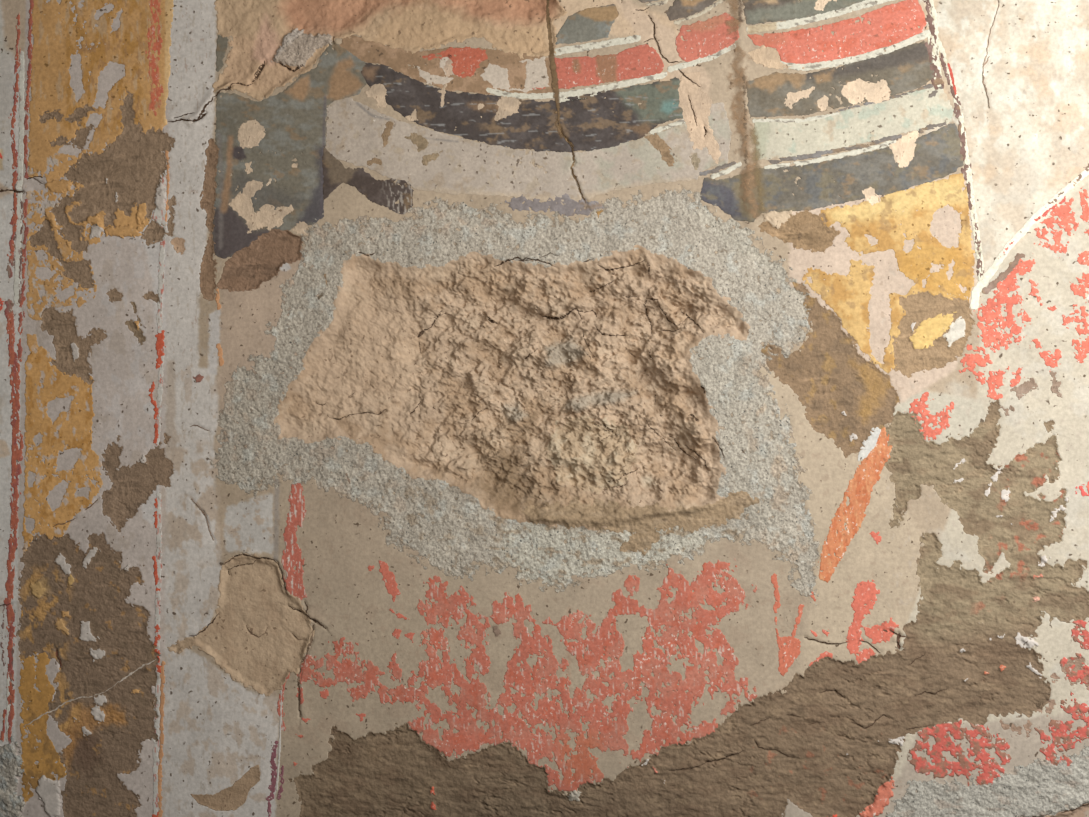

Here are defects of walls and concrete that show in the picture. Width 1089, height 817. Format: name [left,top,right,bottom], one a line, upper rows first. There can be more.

crack [0,176,43,193]
peeling [29,89,186,288]
crack [168,60,303,122]
crack [560,129,586,202]
peeling [16,433,315,817]
peeling [273,245,1089,817]